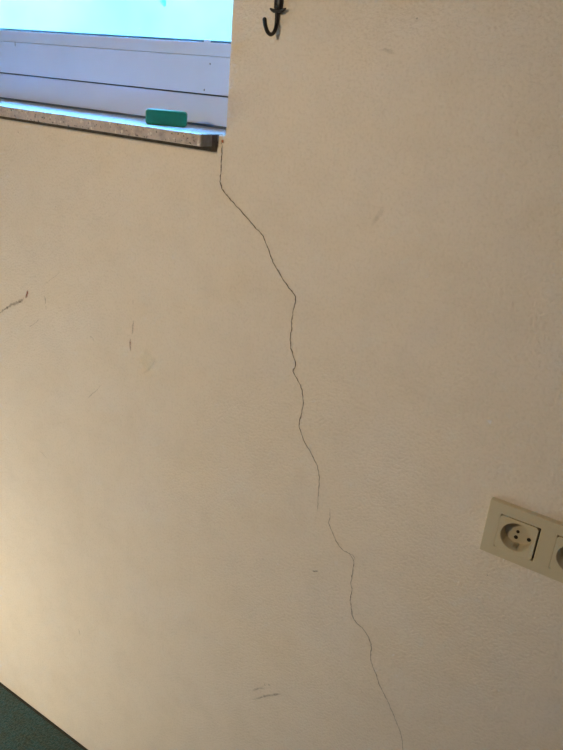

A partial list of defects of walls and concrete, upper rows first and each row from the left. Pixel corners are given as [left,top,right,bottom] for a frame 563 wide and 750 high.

crack [220,148,320,495]